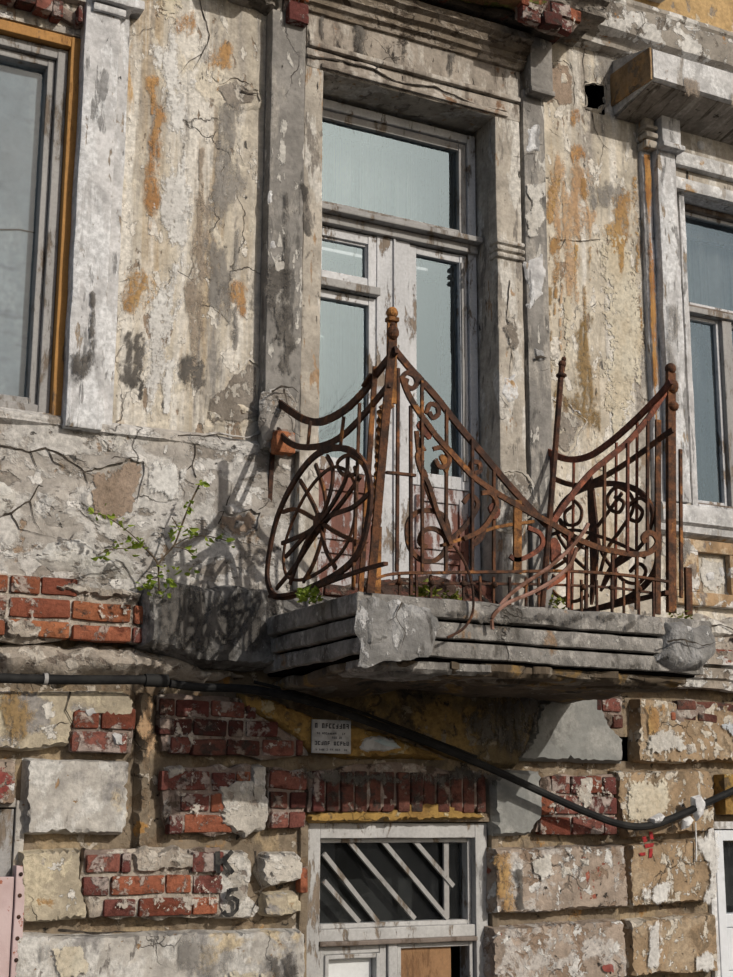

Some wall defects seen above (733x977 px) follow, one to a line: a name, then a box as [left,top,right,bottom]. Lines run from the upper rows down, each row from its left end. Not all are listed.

crack [180,0,212,73]
flaking render [550,58,607,115]
leakage [119,0,246,414]
leakage [70,291,98,381]
leakage [548,182,645,434]
flaking render [198,356,297,458]
crack [0,445,120,538]
flaking render [0,573,244,683]
spalling [662,535,733,652]
flaking render [597,696,628,761]
flaking render [648,699,733,755]
flaking render [68,693,308,921]